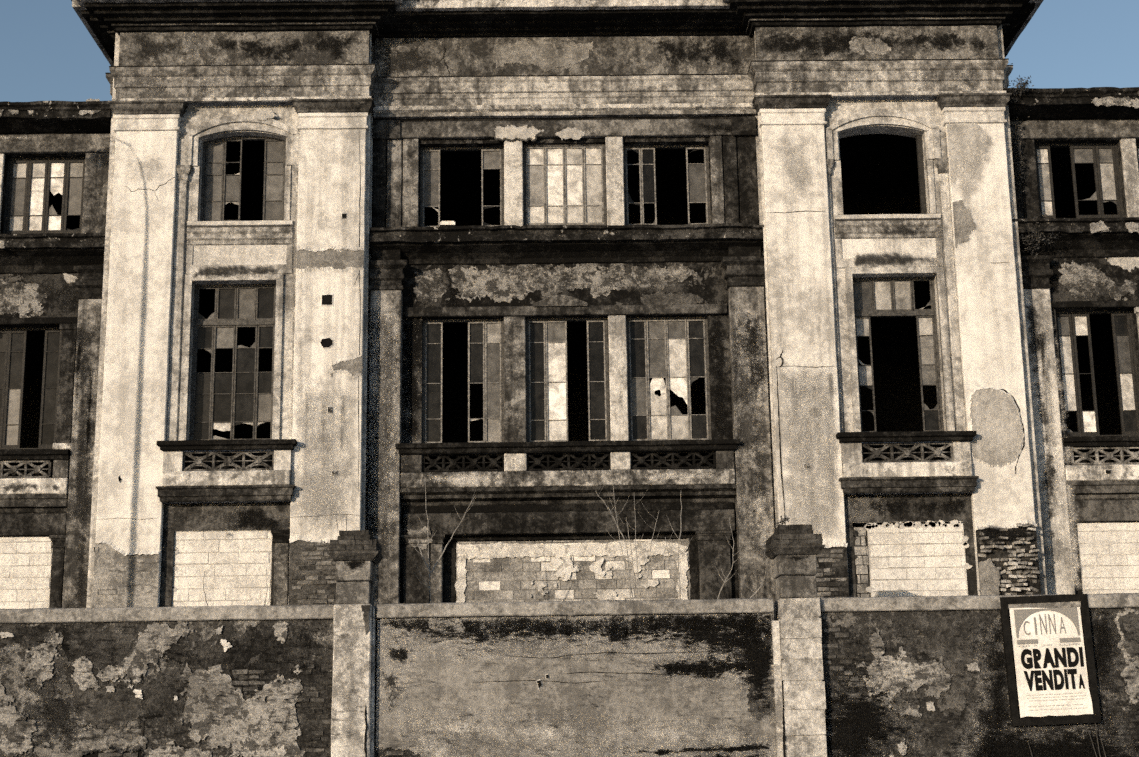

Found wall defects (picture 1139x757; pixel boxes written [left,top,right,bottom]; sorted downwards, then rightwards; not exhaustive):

peeling [1093,96,1139,109]
flaking render [0,274,48,318]
flaking render [413,262,704,305]
flaking render [1058,257,1139,301]
spalling [968,386,1025,468]
spalling [92,539,160,608]
flaking render [288,535,337,605]
flaking render [976,520,1041,595]
flaking render [0,620,332,757]
water stain [381,613,772,643]
water stain [663,663,724,679]
flaking render [906,610,985,712]